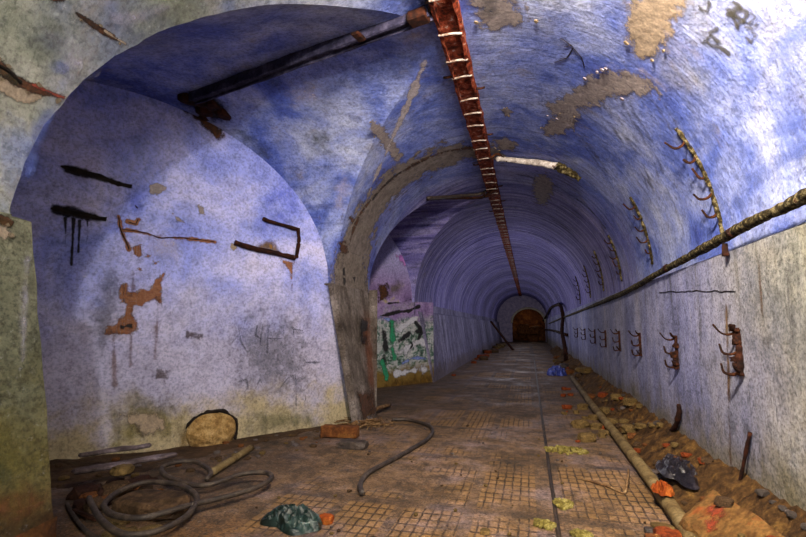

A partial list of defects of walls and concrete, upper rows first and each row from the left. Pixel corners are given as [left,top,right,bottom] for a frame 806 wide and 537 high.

spalling [75,12,127,45]
flaking render [467,0,539,31]
flaking render [623,0,686,62]
spalling [0,57,66,104]
flaking render [540,62,663,139]
spalling [364,60,427,205]
flaking render [104,273,165,335]